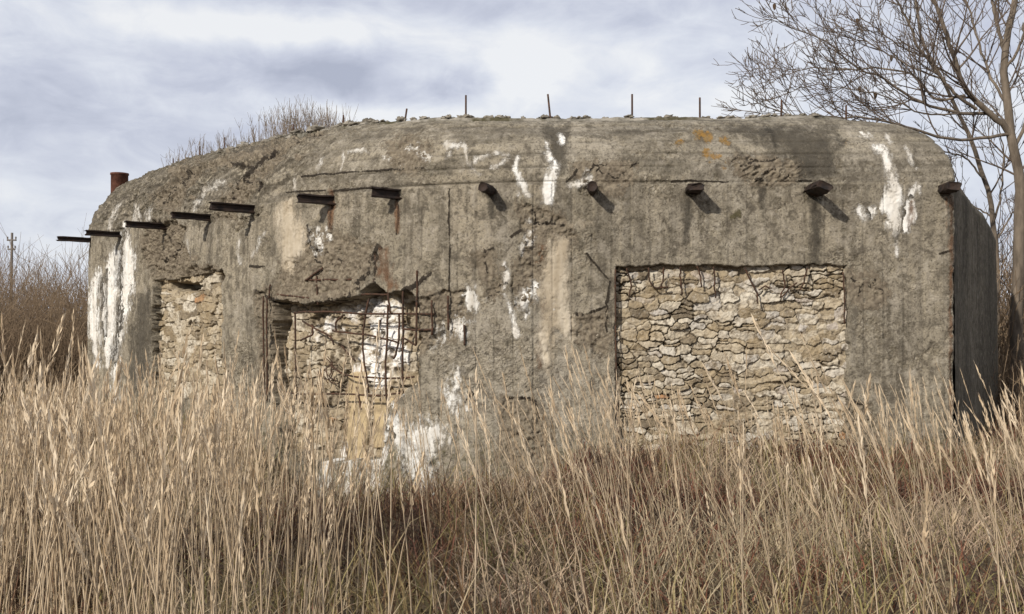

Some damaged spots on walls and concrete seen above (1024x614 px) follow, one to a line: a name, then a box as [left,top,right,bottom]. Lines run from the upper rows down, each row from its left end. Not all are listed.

water stain [444,122,594,205]
crack [566,162,639,183]
efflorescence [856,131,921,255]
water stain [87,204,162,407]
spalling [252,196,580,411]
water stain [319,366,471,497]